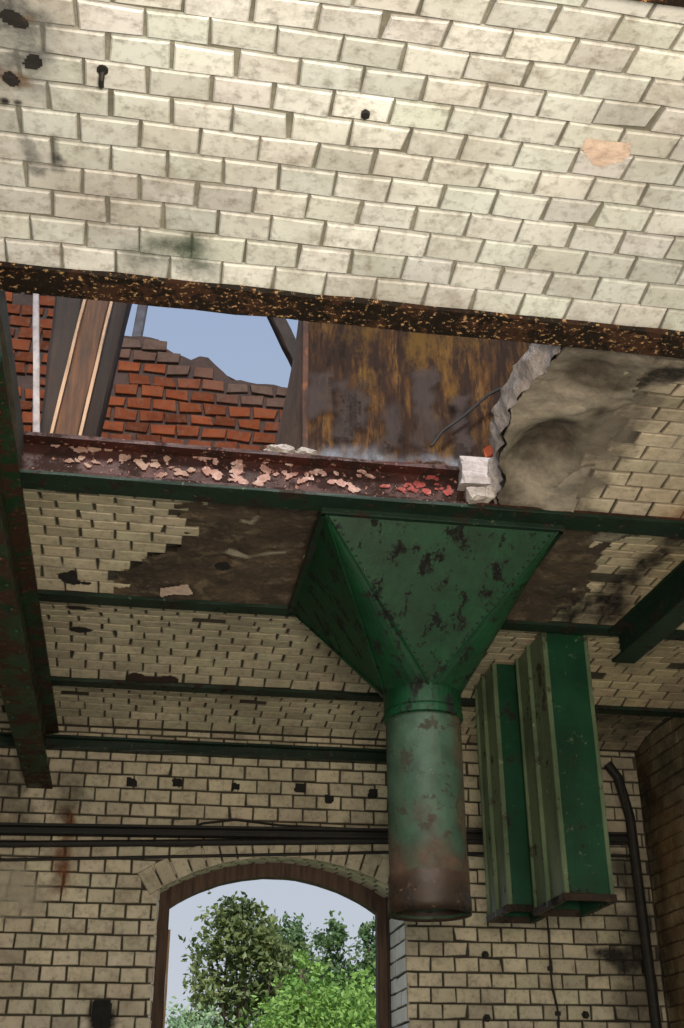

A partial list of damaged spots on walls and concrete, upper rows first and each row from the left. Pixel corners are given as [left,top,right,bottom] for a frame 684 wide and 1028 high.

spalling [581,138,632,167]
leakage [636,368,684,387]
spalling [113,501,319,606]
leakage [554,538,684,623]